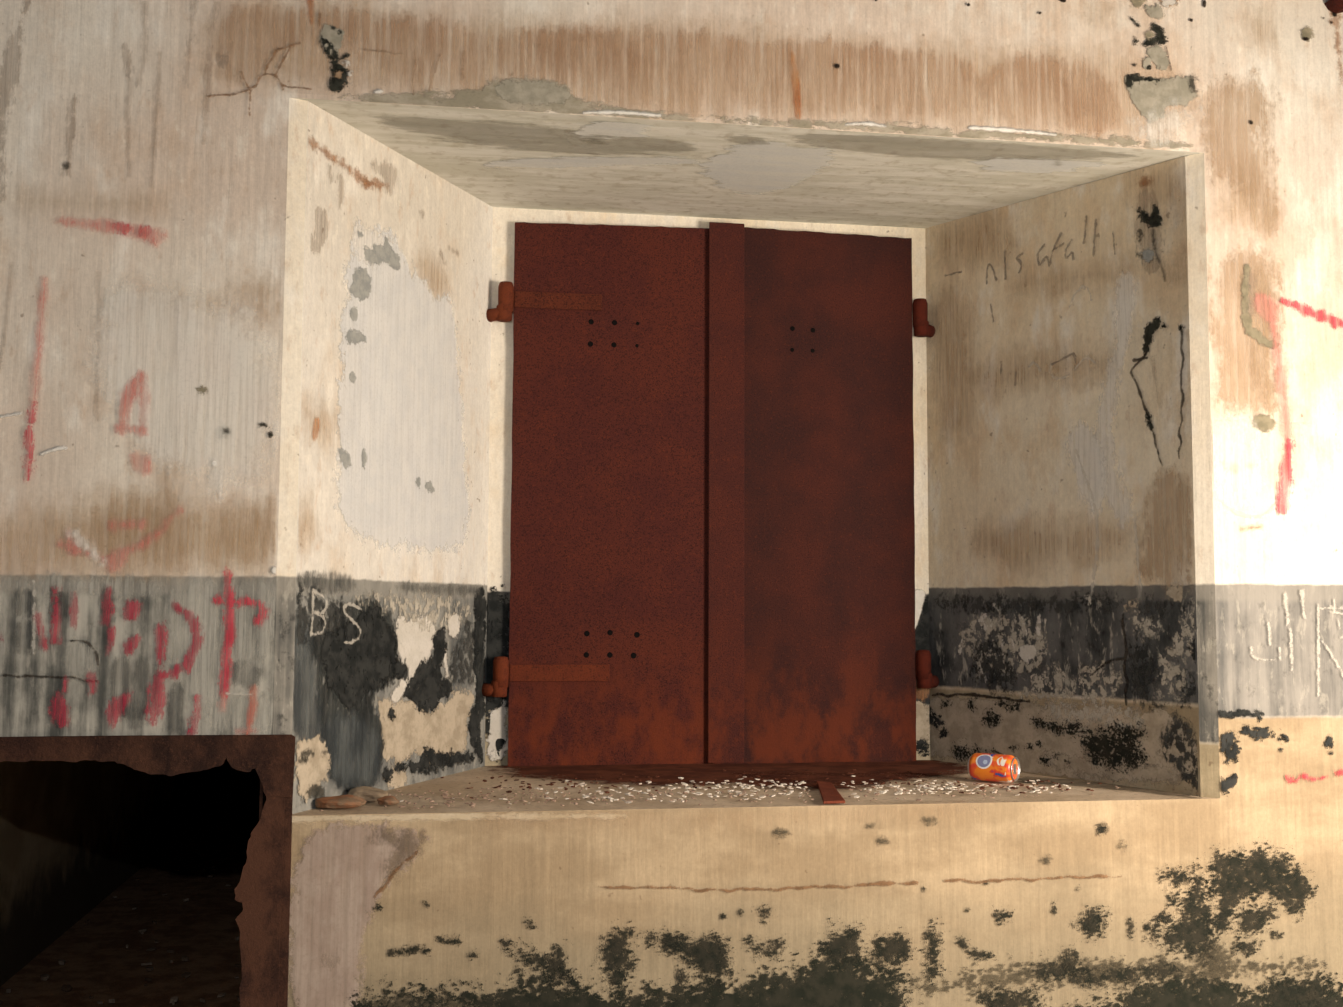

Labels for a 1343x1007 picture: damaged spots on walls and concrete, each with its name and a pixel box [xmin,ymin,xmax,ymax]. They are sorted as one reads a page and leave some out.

crack [207,13,321,116]
spalling [319,24,695,139]
peeling [484,0,1198,195]
crack [1130,316,1185,463]
rust [490,760,968,791]
damp [929,693,1200,798]
damp [346,837,1343,1007]